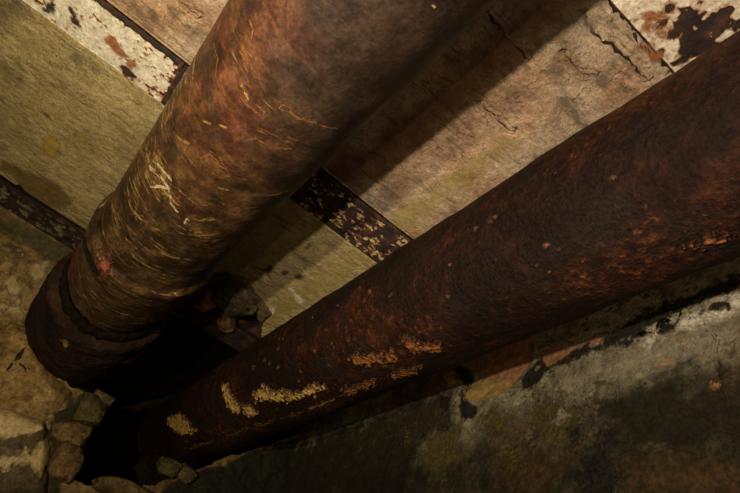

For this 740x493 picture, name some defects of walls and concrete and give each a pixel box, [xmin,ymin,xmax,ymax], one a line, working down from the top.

peeling [23,0,185,102]
crack [483,8,532,62]
crack [560,50,598,81]
crack [577,0,669,82]
peeling [611,0,740,72]
peeling [299,173,408,260]
corrosion [167,411,198,436]
corrosion [221,370,377,426]
water stain [162,366,477,493]
corrosion [347,347,423,380]
water stain [522,273,740,389]
water stain [575,452,740,493]